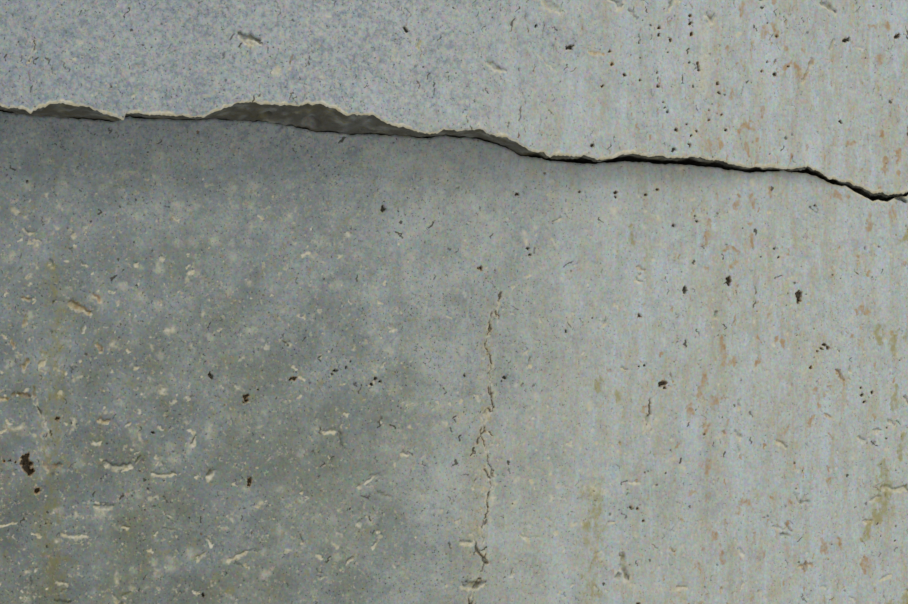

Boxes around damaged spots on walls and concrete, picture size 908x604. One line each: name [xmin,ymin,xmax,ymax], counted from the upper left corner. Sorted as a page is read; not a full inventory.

crack [0,0,908,204]
crack [465,288,505,604]